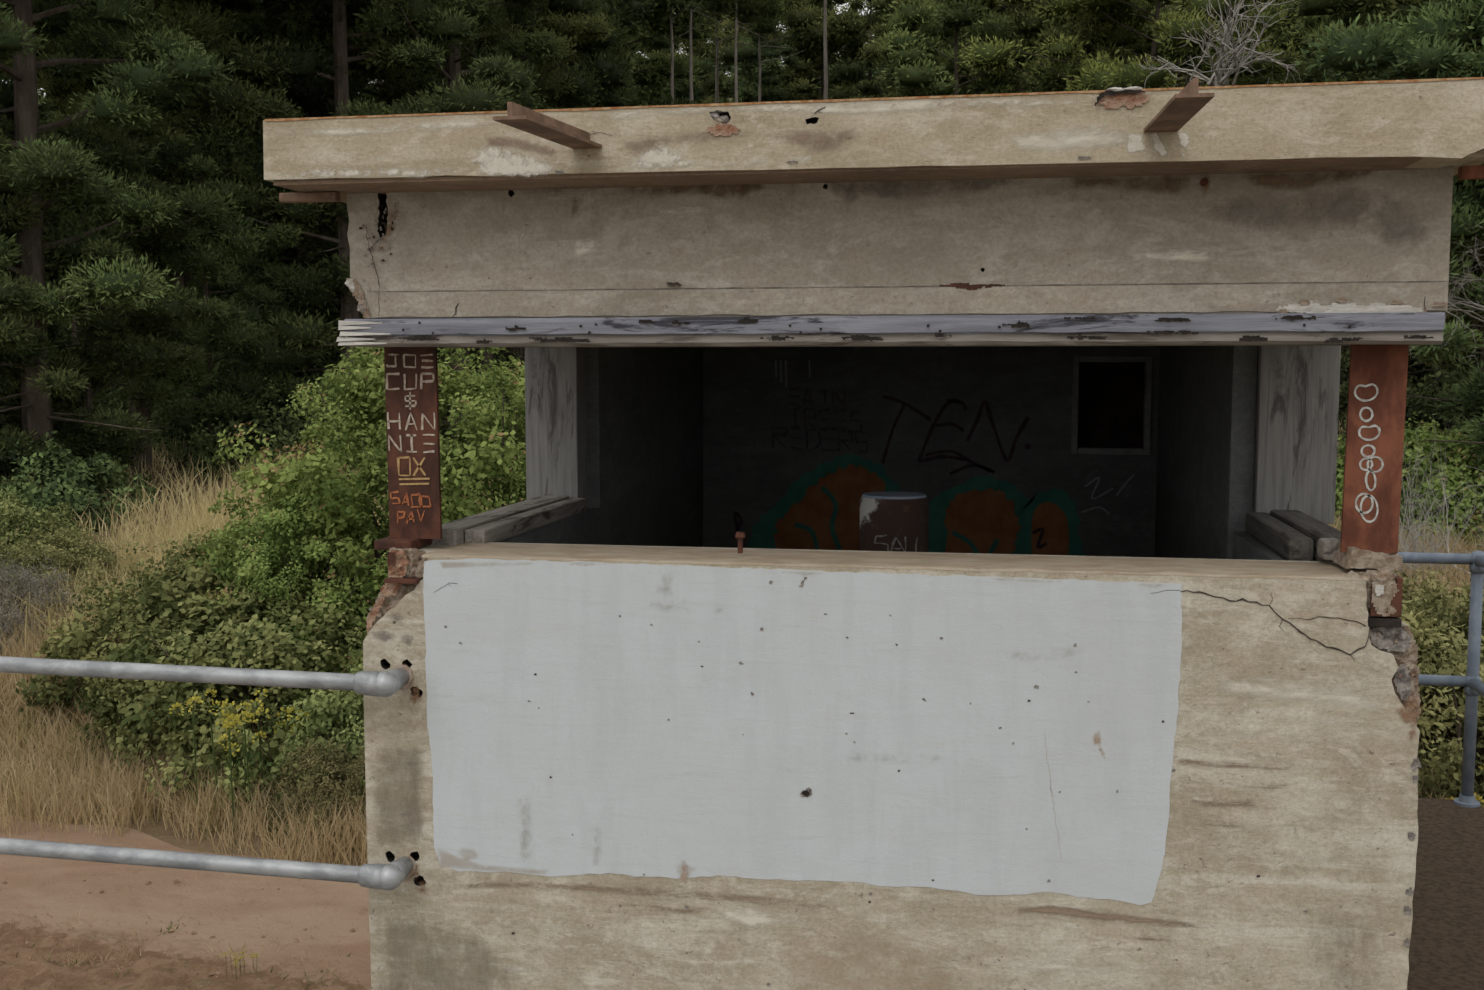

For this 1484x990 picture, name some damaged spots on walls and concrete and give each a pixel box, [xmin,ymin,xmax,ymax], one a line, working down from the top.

spalling [1095,86,1150,109]
spalling [345,277,371,319]
spalling [366,547,428,636]
crack [1156,590,1370,660]
spalling [1356,567,1421,726]